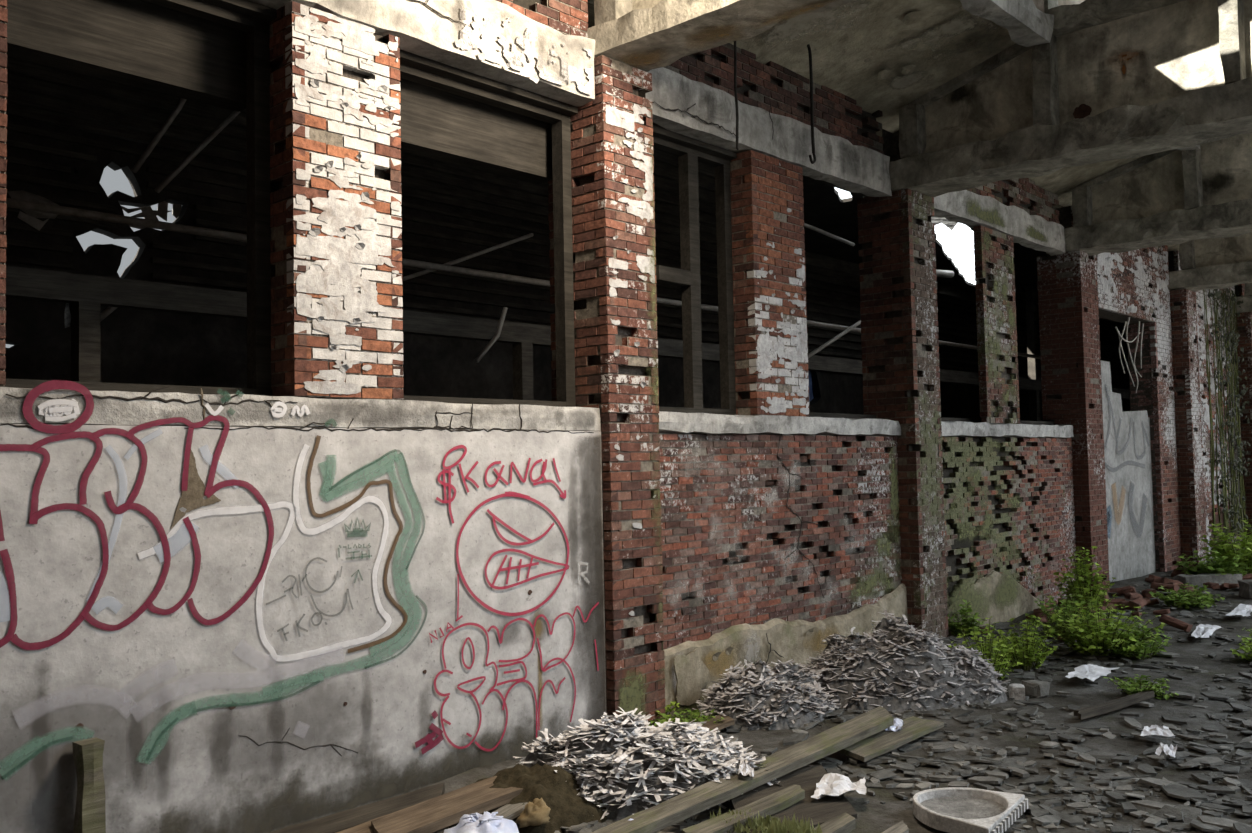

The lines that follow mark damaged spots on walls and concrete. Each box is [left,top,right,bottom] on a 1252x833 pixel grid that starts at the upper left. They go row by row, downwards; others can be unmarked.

crack [410,0,470,27]
peeling [294,7,399,137]
peeling [296,154,399,394]
peeling [608,235,655,297]
peeling [1097,249,1181,316]
peeling [755,230,809,414]
flaking render [673,646,733,706]
crack [238,728,358,756]
leakage [153,718,567,833]